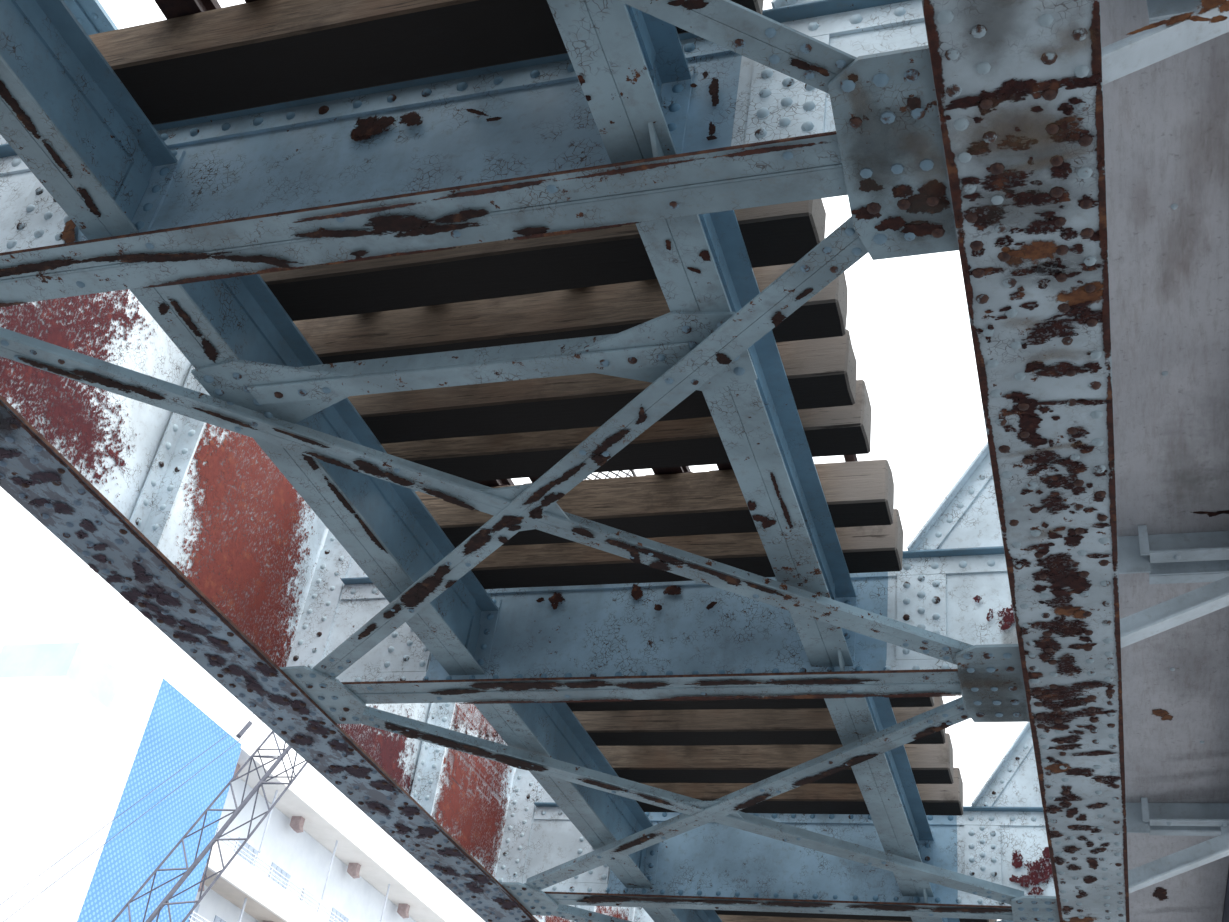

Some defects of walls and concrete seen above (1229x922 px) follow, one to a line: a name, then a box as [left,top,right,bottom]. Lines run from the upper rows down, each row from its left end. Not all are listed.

corrosion [1127,0,1229,35]
corrosion [292,141,831,223]
corrosion [143,246,467,288]
corrosion [508,222,640,240]
corrosion [923,0,1097,922]
corrosion [1089,0,1130,922]
corrosion [0,401,276,670]
corrosion [332,725,403,794]
corrosion [427,817,536,922]